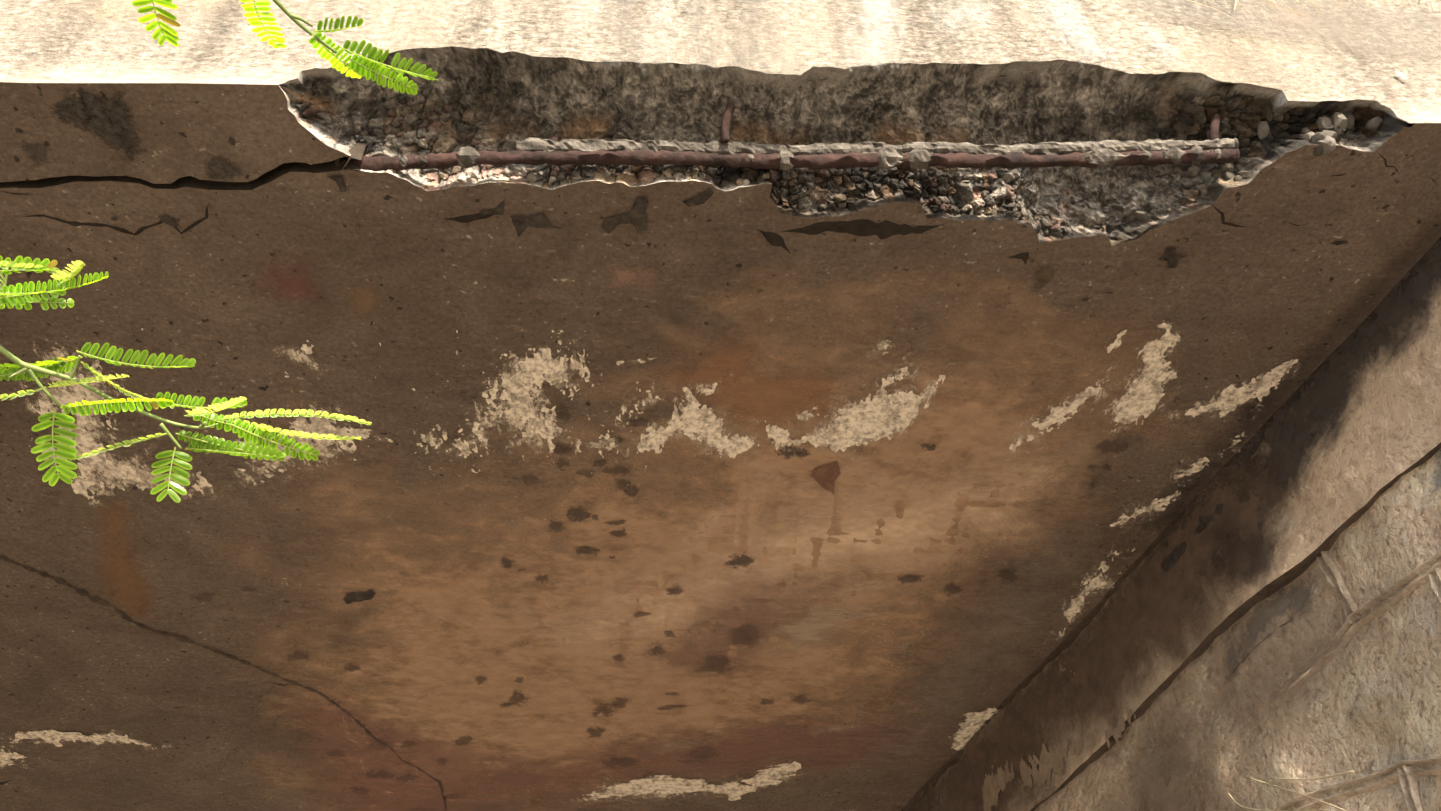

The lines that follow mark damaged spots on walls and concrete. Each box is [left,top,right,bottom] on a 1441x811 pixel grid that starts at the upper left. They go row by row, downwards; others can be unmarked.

spalling [278,46,1409,247]
crack [0,140,368,239]
peeling [274,340,318,378]
peeling [233,404,393,485]
damp [552,418,650,497]
peeling [413,330,946,494]
damp [770,438,809,459]
damp [550,505,626,537]
damp [725,554,754,568]
damp [898,237,1441,811]
crack [0,556,447,810]
crack [1225,617,1294,683]